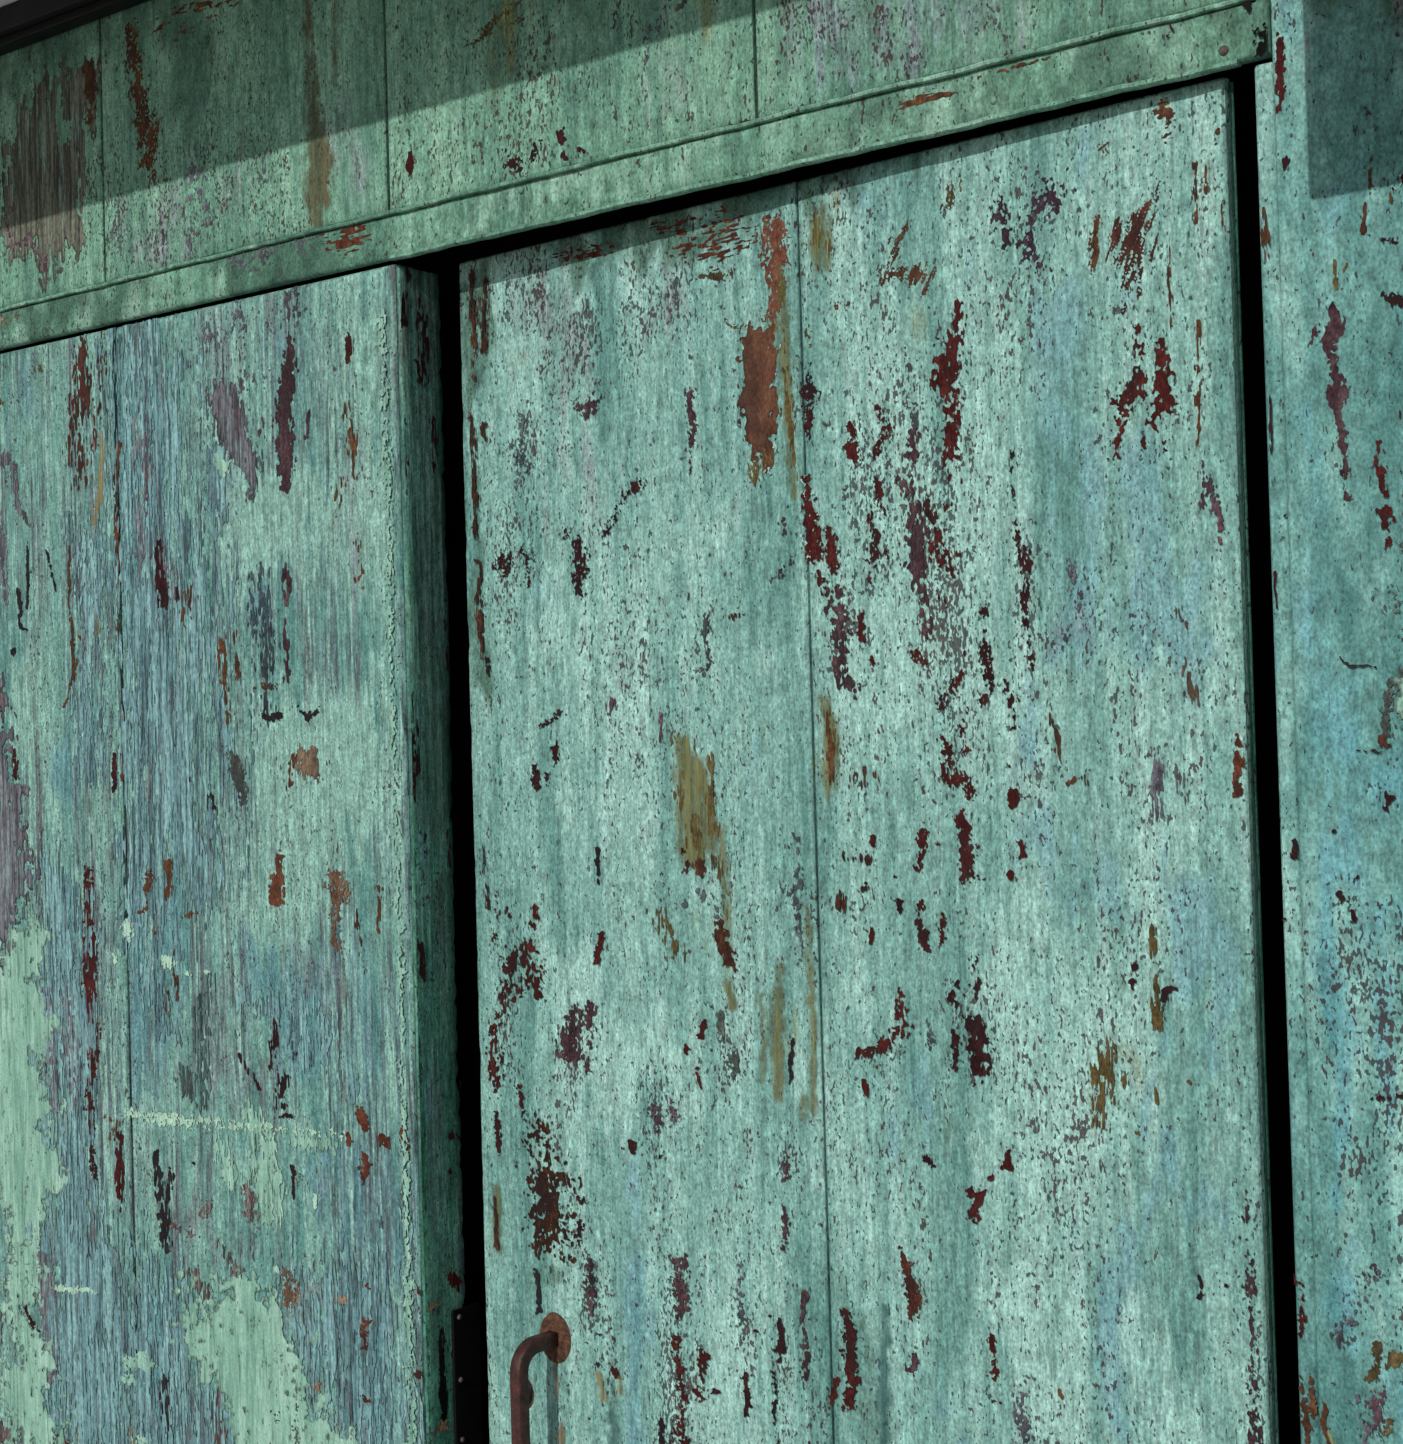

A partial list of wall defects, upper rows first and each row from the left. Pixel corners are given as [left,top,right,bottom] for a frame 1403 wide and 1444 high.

peeling [0,51,107,294]
peeling [108,184,134,255]
peeling [171,126,227,260]
corrosion [753,213,794,324]
peeling [1104,323,1178,461]
peeling [1307,301,1353,501]
peeling [769,473,875,700]
peeling [1377,665,1403,749]
peeling [0,236,435,1444]
corrosion [678,848,706,878]
peeling [1382,791,1396,812]
peeling [485,891,615,1344]